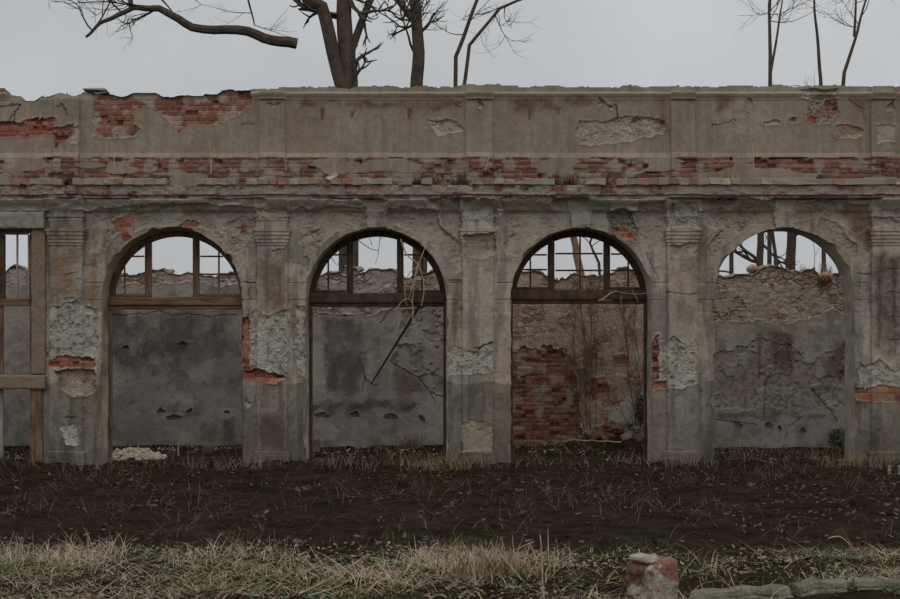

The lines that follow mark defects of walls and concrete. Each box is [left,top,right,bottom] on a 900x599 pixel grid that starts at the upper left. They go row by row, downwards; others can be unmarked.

flaking render [0,115,81,146]
flaking render [92,89,253,138]
spalling [575,95,667,146]
spalling [759,87,866,139]
spalling [792,198,900,254]
spalling [46,298,101,396]
spalling [242,305,330,398]
spalling [390,307,496,395]
flaking render [513,344,585,446]
spalling [651,330,701,390]
spalling [714,337,900,429]